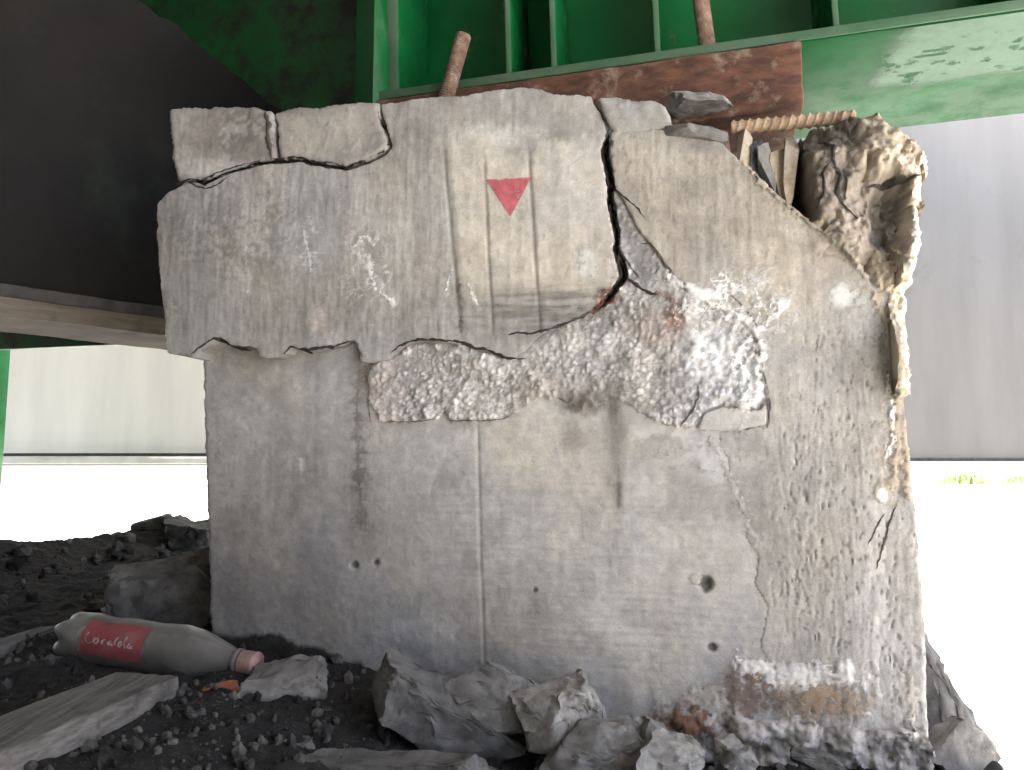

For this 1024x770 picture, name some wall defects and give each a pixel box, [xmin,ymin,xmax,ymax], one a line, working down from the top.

crack [174,100,390,189]
spalling [661,91,856,209]
damp [349,221,396,307]
crack [391,102,772,428]
crack [191,336,253,354]
crack [284,341,349,354]
spalling [367,192,767,431]
crack [868,500,899,568]
rust [656,705,719,738]
rust [718,671,872,719]